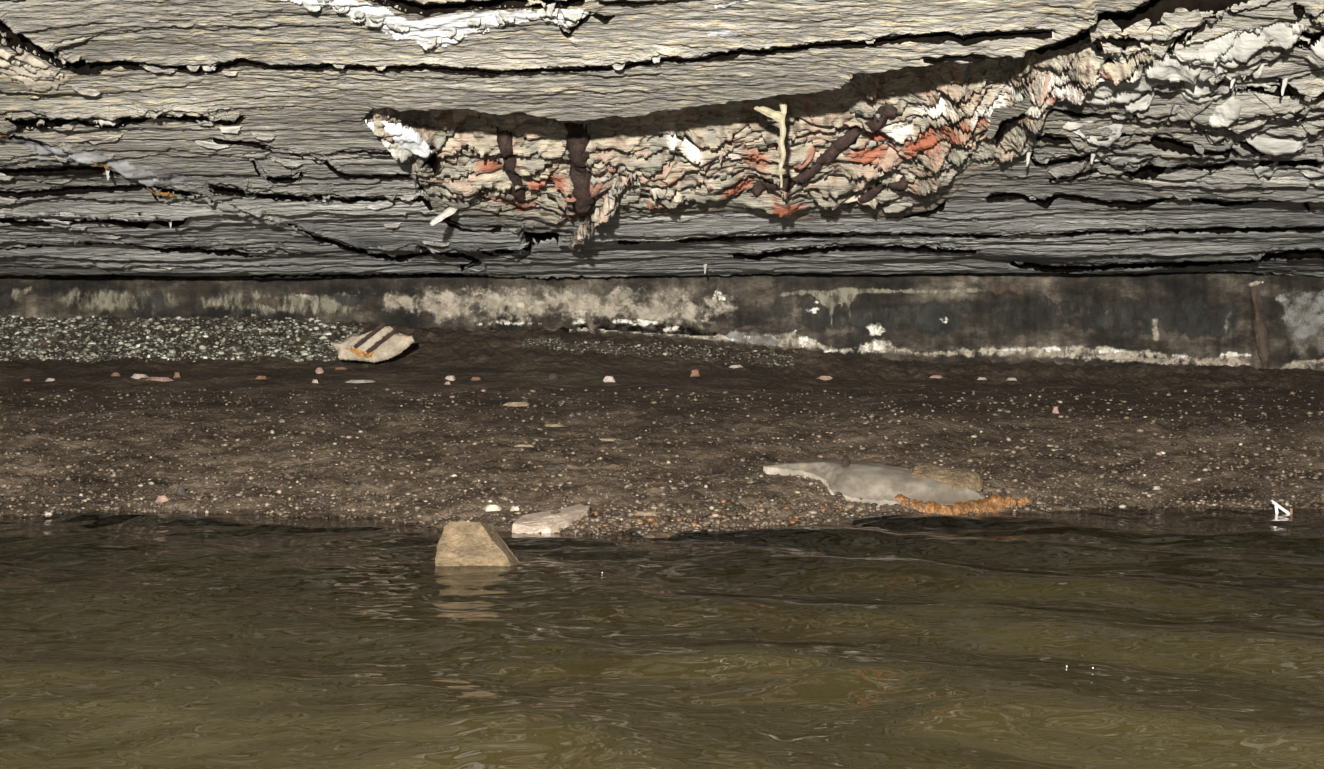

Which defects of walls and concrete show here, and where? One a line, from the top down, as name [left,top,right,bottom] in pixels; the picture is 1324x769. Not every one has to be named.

peeling [281,0,595,51]
spalling [365,20,1324,264]
crack [0,0,1324,369]
peeling [38,218,123,239]
peeling [157,192,313,239]
peeling [93,260,160,269]
water stain [0,287,32,308]
water stain [59,289,174,319]
water stain [201,291,362,315]
water stain [383,286,1251,366]
water stain [1276,290,1324,369]